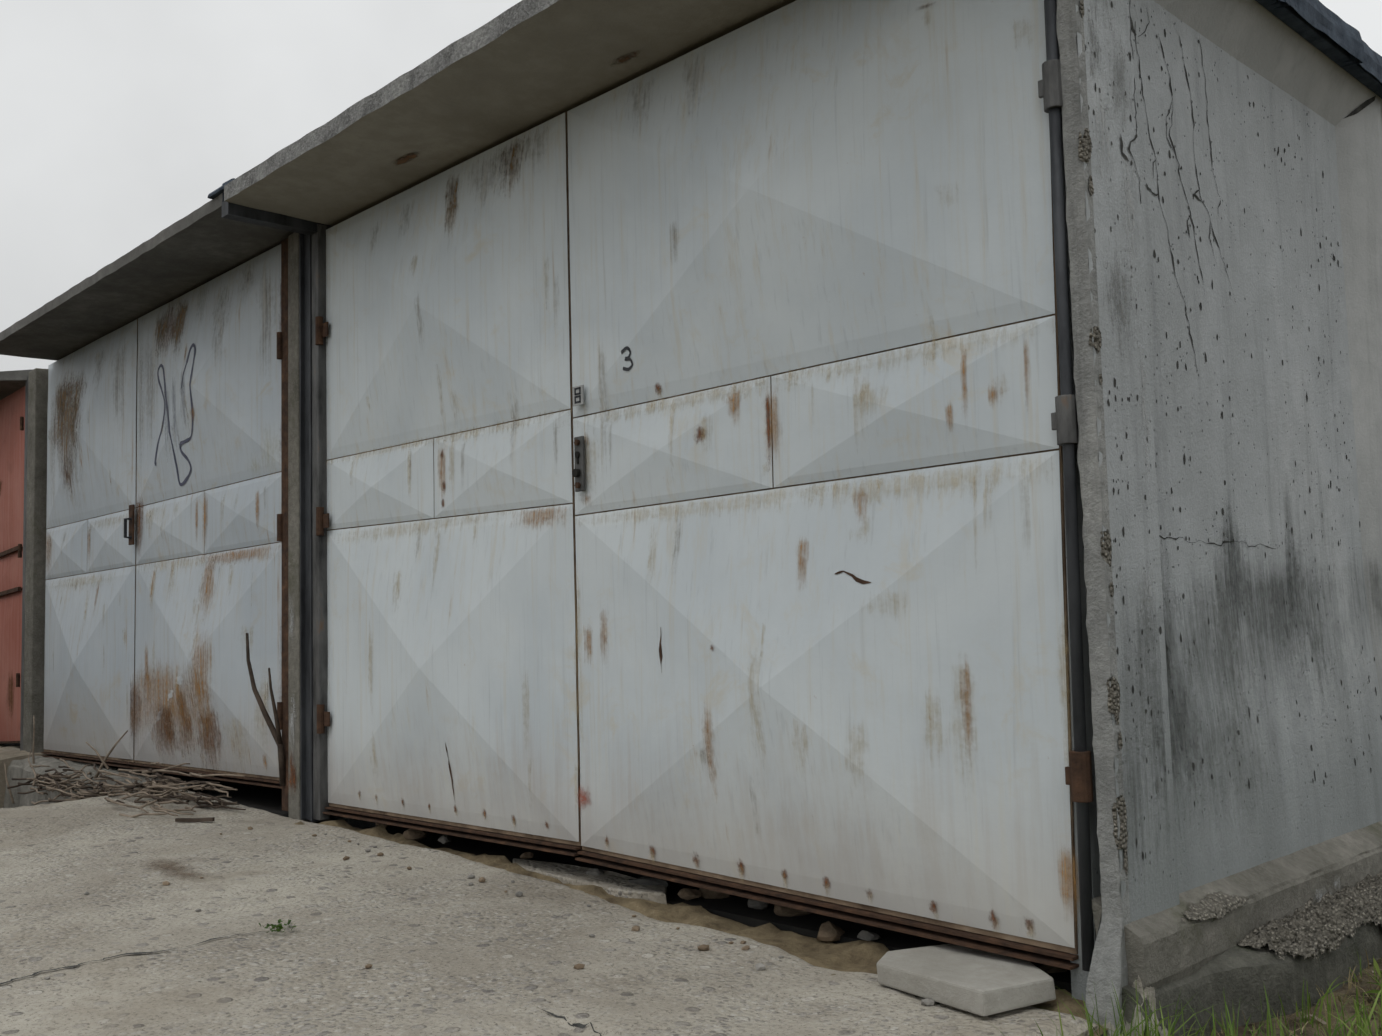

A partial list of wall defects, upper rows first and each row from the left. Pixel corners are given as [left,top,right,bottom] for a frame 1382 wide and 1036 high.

crack [1121,8,1236,371]
corrosion [766,398,777,447]
corrosion [130,649,220,758]
spalling [1181,891,1249,922]
spalling [1237,870,1382,960]